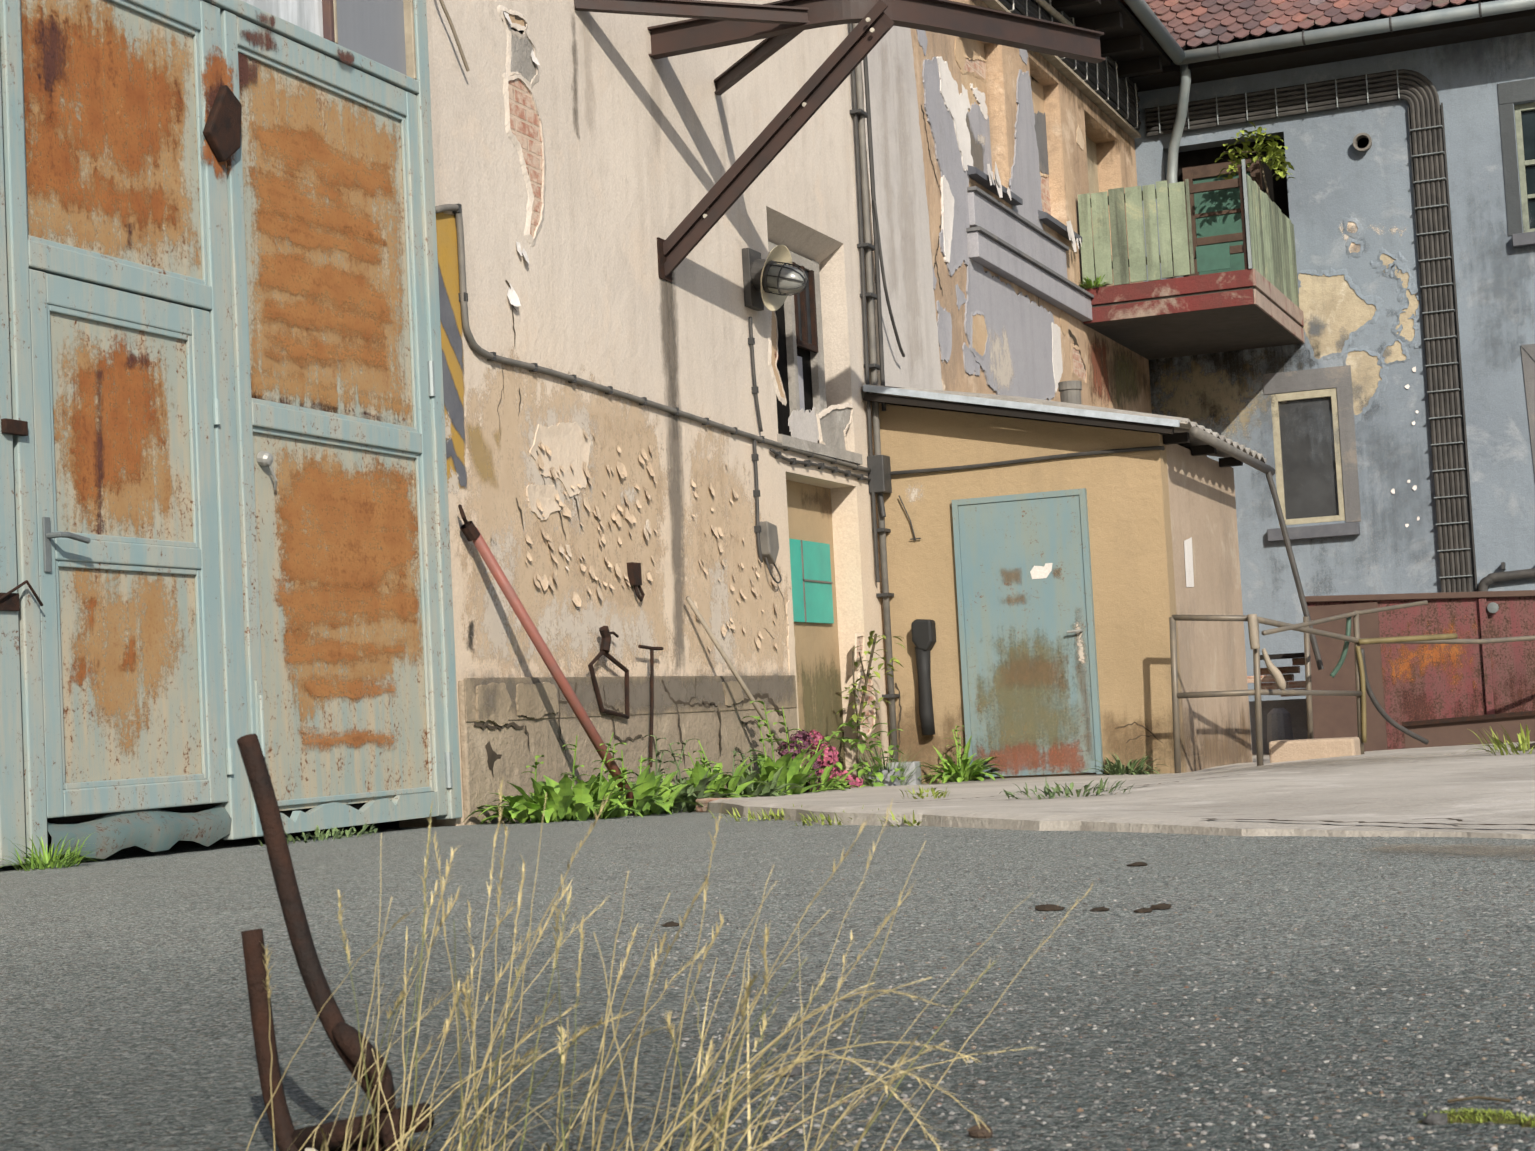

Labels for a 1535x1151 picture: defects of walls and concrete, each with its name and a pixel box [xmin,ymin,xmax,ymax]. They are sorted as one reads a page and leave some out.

corrosion [53,332,176,535]
corrosion [21,0,411,424]
corrosion [275,448,422,750]
spalling [497,5,547,264]
peeling [445,348,798,726]
peeling [916,29,1082,401]
corrosion [976,622,1090,774]
peeling [1076,126,1084,150]
peeling [1297,215,1422,425]
corrosion [1381,624,1535,748]